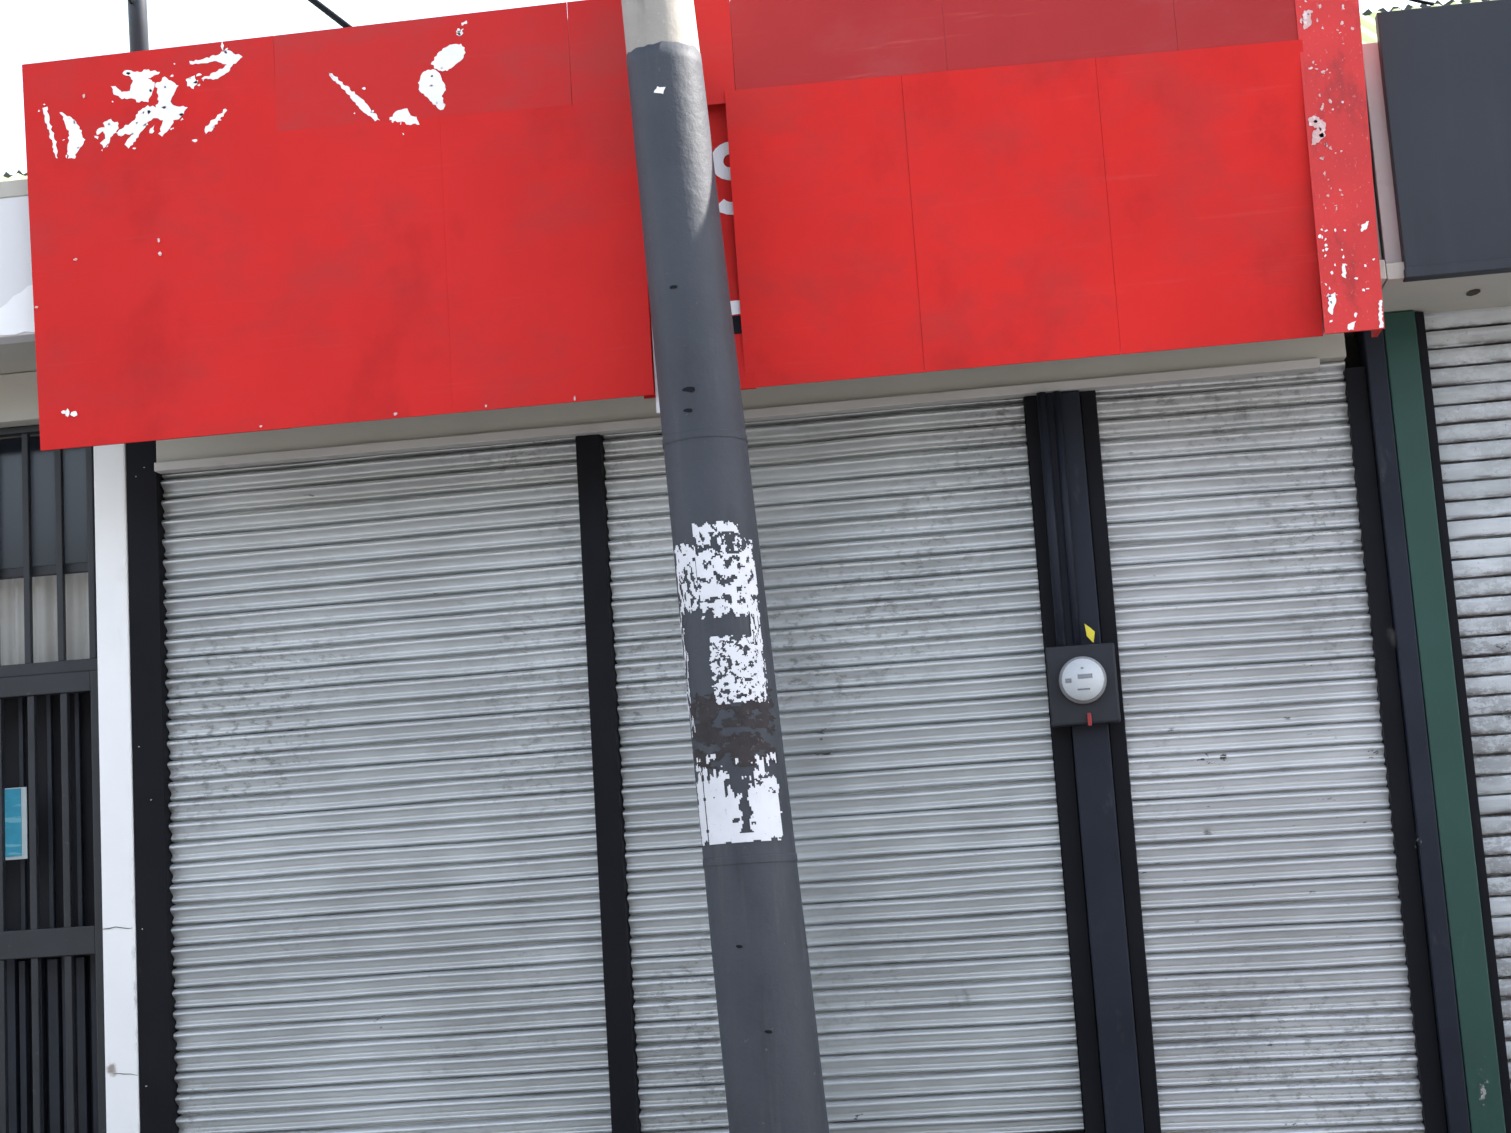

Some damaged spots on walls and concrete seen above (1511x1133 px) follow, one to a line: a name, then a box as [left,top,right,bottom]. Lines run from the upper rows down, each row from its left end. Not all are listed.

peeling [38,41,242,159]
peeling [328,72,420,135]
peeling [418,21,467,110]
peeling [1308,94,1344,210]
peeling [1300,0,1354,44]
peeling [1318,221,1384,330]